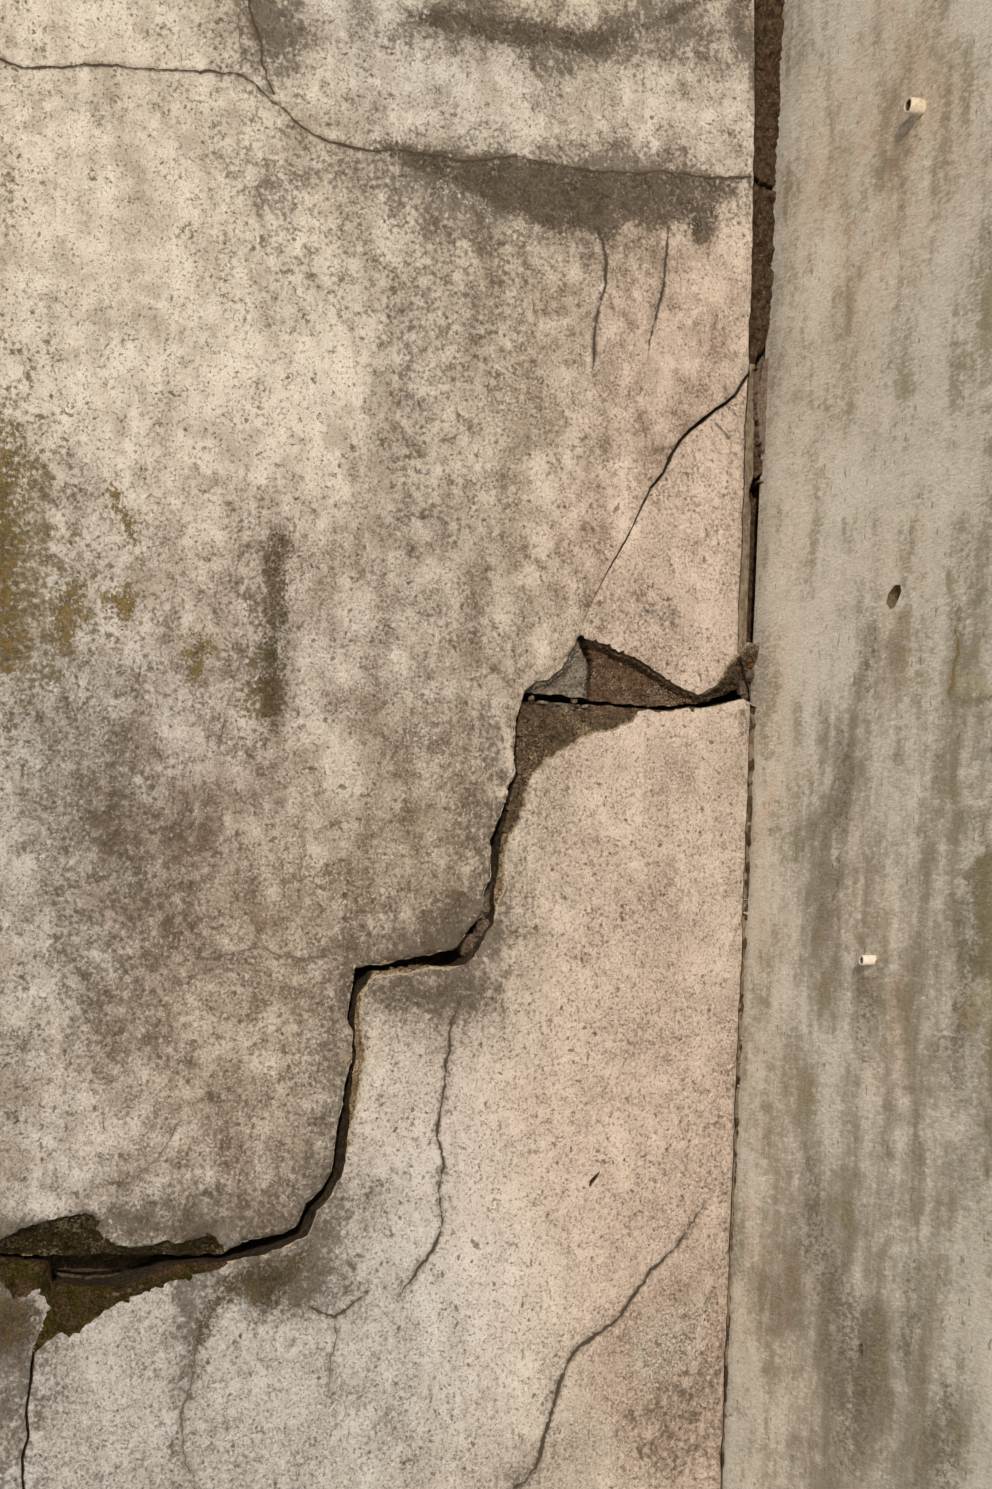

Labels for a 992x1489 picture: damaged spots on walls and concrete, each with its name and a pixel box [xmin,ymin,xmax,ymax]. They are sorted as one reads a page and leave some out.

crack [0,0,751,179]
leakage [374,137,739,254]
crack [591,328,769,603]
spalling [504,635,702,833]
crack [0,642,760,1489]
leakage [936,816,990,1089]
leakage [798,1161,921,1471]
leakage [927,1382,961,1489]